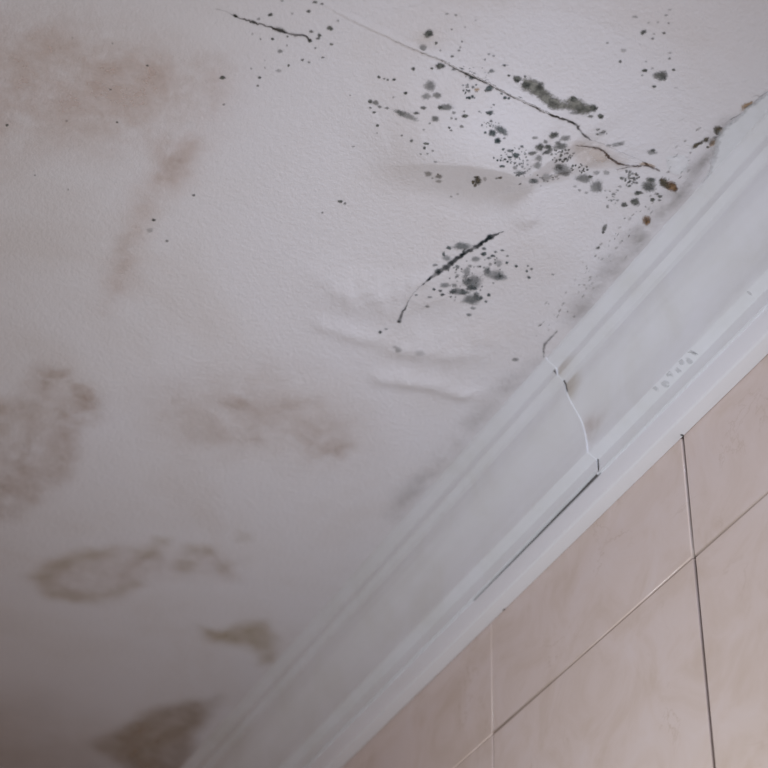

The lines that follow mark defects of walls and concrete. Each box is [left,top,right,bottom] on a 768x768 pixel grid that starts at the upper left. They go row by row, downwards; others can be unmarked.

crack [236,16,309,40]
crack [318,0,660,171]
water stain [463,65,603,119]
water stain [484,104,600,191]
water stain [620,171,662,207]
crack [423,232,502,285]
water stain [429,278,490,304]